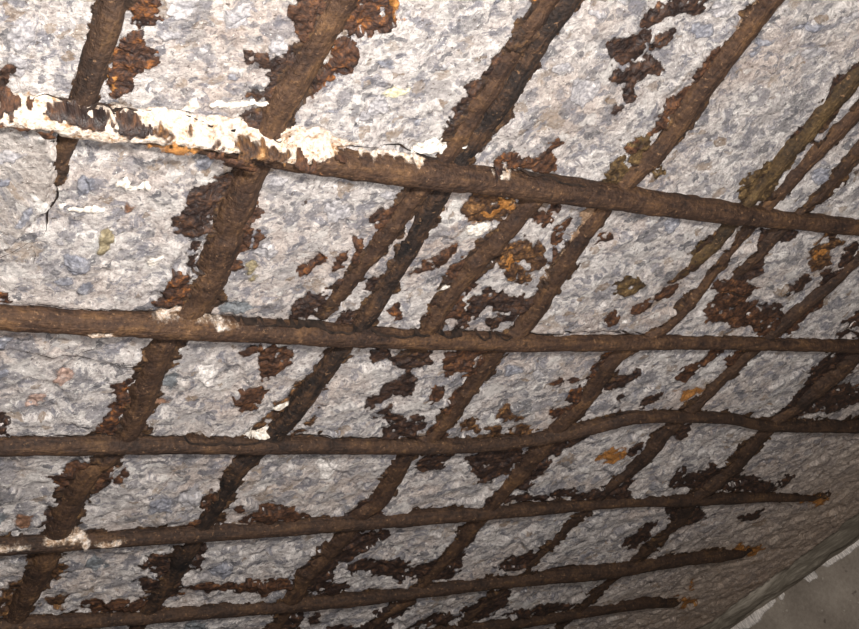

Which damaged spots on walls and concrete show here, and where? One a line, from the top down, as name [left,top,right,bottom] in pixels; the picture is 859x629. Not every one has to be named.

rust [0,0,328,315]
rust [287,0,405,138]
rust [289,187,433,324]
damp [410,138,447,158]
spalling [0,0,859,444]
rust [438,0,540,154]
rust [436,204,595,334]
rust [601,0,758,184]
rust [604,224,859,340]
rust [364,349,641,441]
rust [157,524,480,629]
spalling [0,403,859,629]